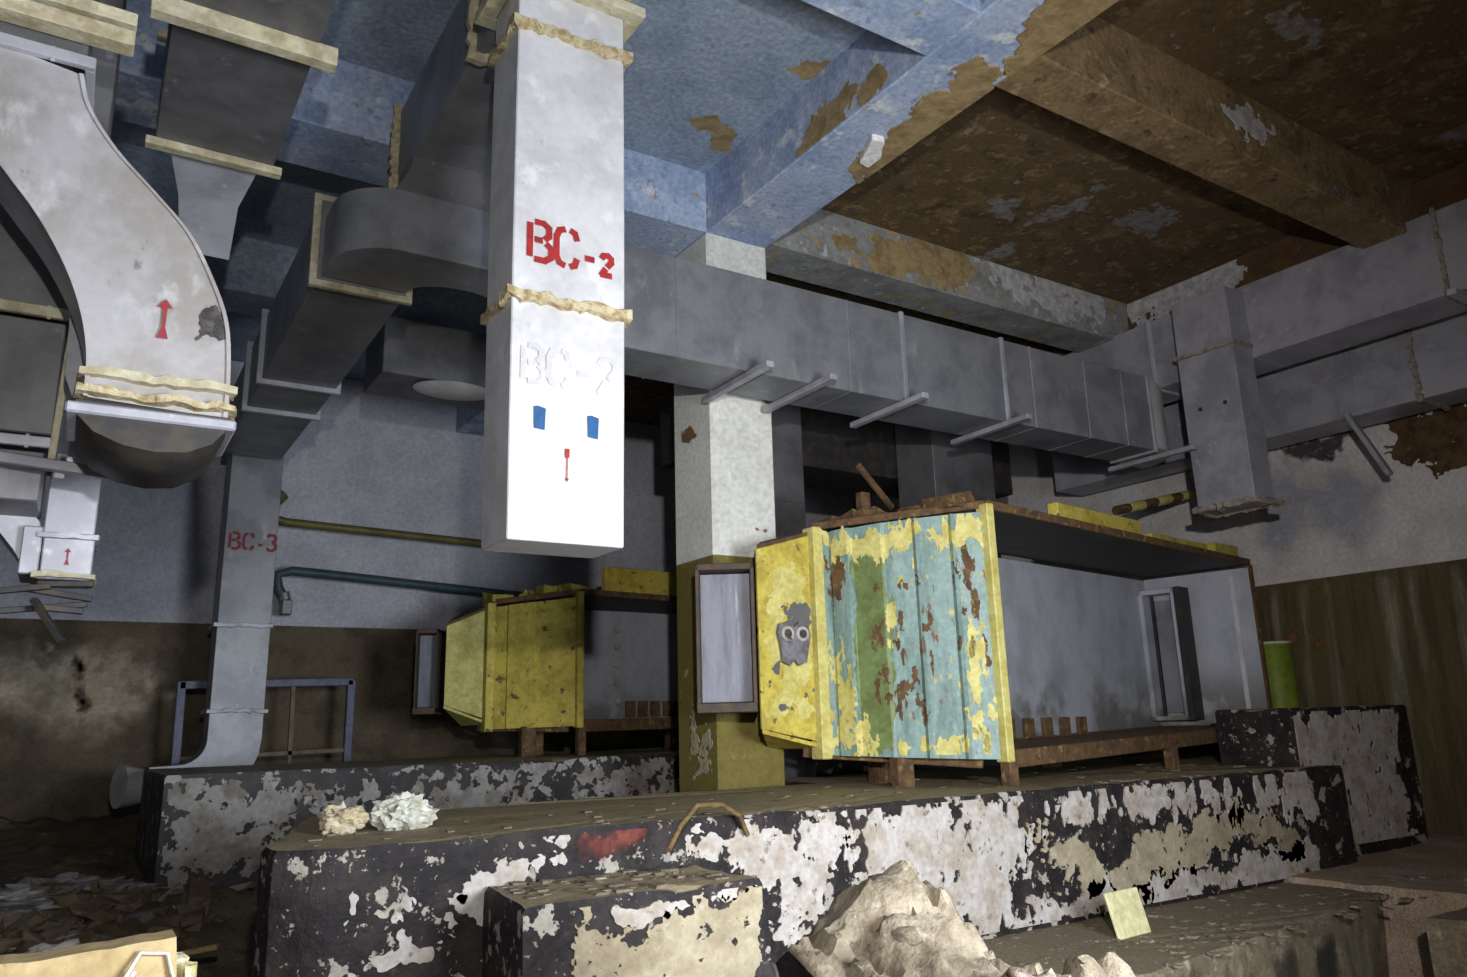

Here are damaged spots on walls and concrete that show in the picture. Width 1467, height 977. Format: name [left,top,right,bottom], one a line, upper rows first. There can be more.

flaking render [689,115,738,153]
flaking render [787,60,831,80]
flaking render [796,64,889,158]
spalling [848,0,1119,184]
flaking render [1383,402,1467,479]
peeling [570,709,1419,977]
peeling [343,891,359,926]
peeling [347,834,571,977]